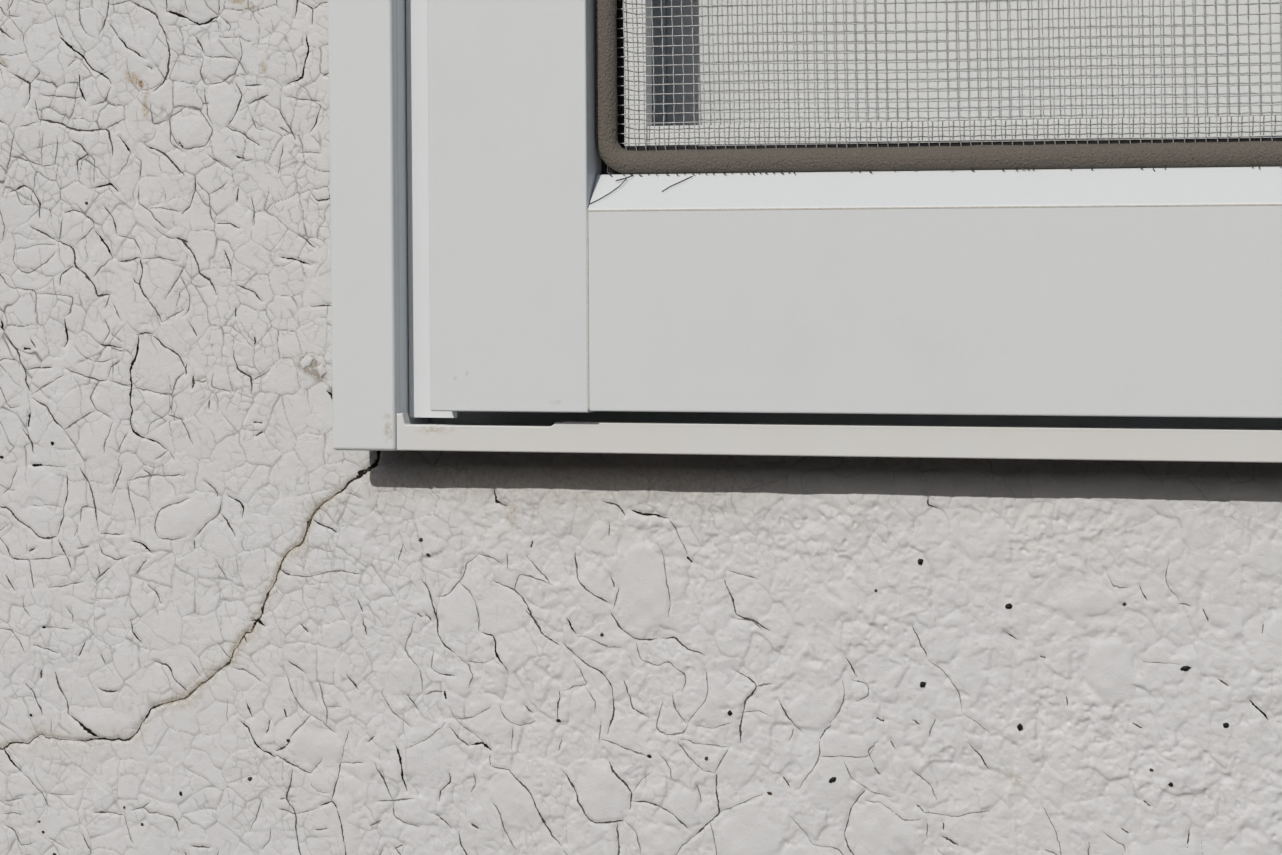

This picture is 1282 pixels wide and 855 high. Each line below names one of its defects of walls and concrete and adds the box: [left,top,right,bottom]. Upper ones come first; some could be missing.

crack [0,0,991,855]